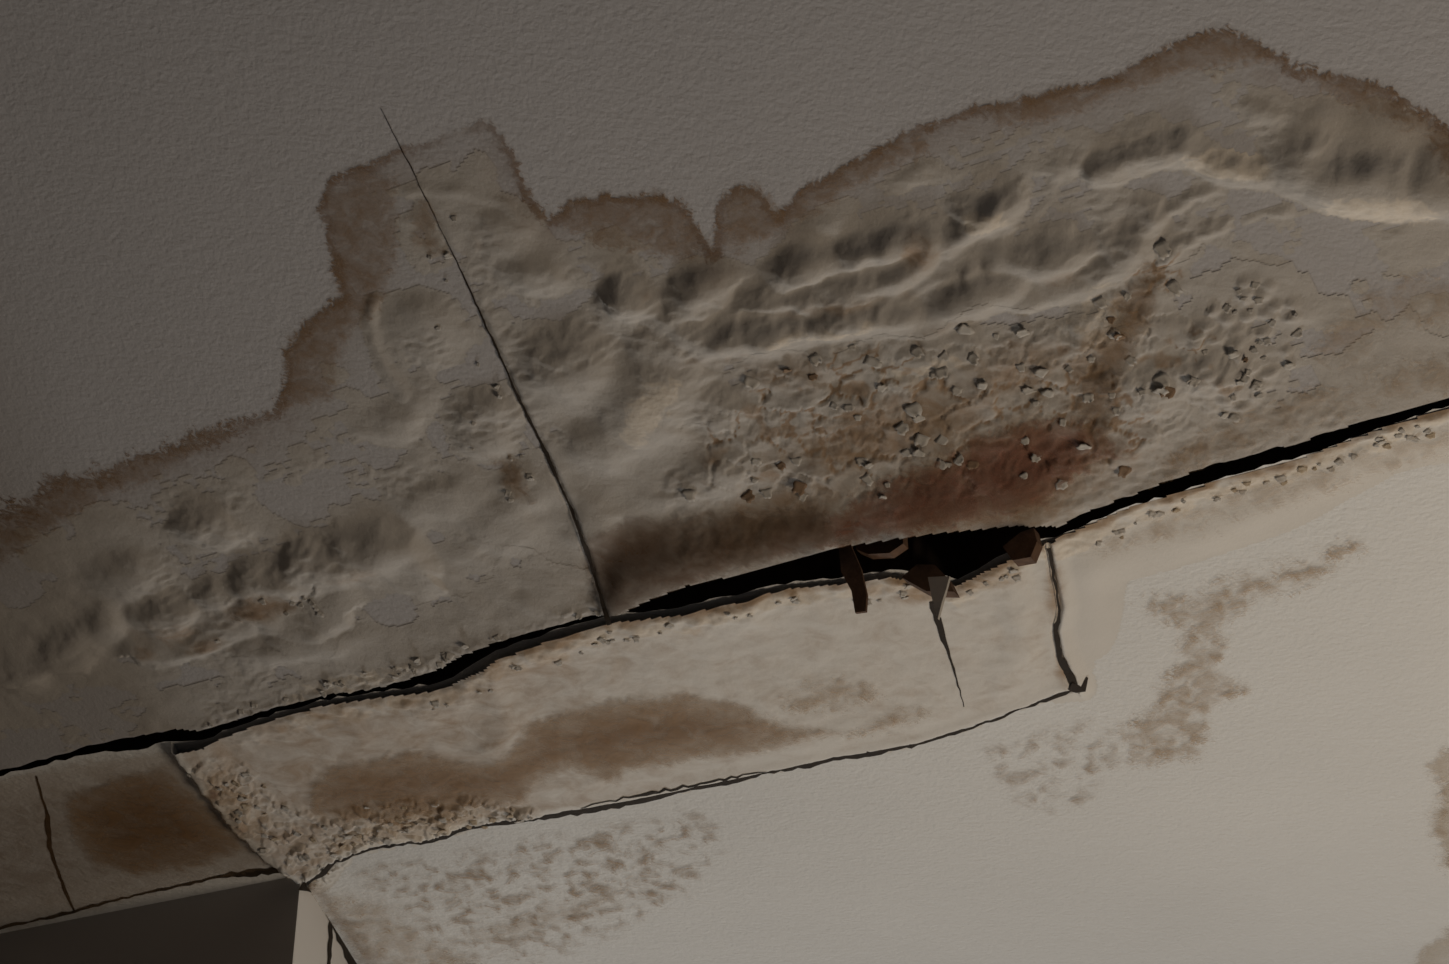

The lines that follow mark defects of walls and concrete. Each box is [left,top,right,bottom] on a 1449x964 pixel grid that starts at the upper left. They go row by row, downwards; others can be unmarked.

water stain [504,25,1449,263]
water stain [0,149,404,539]
crack [0,109,612,930]
peeling [128,240,1449,737]
crack [326,915,357,964]
peeling [174,747,548,895]
water stain [312,697,821,822]
crack [298,398,1449,893]
water stain [1130,547,1356,763]